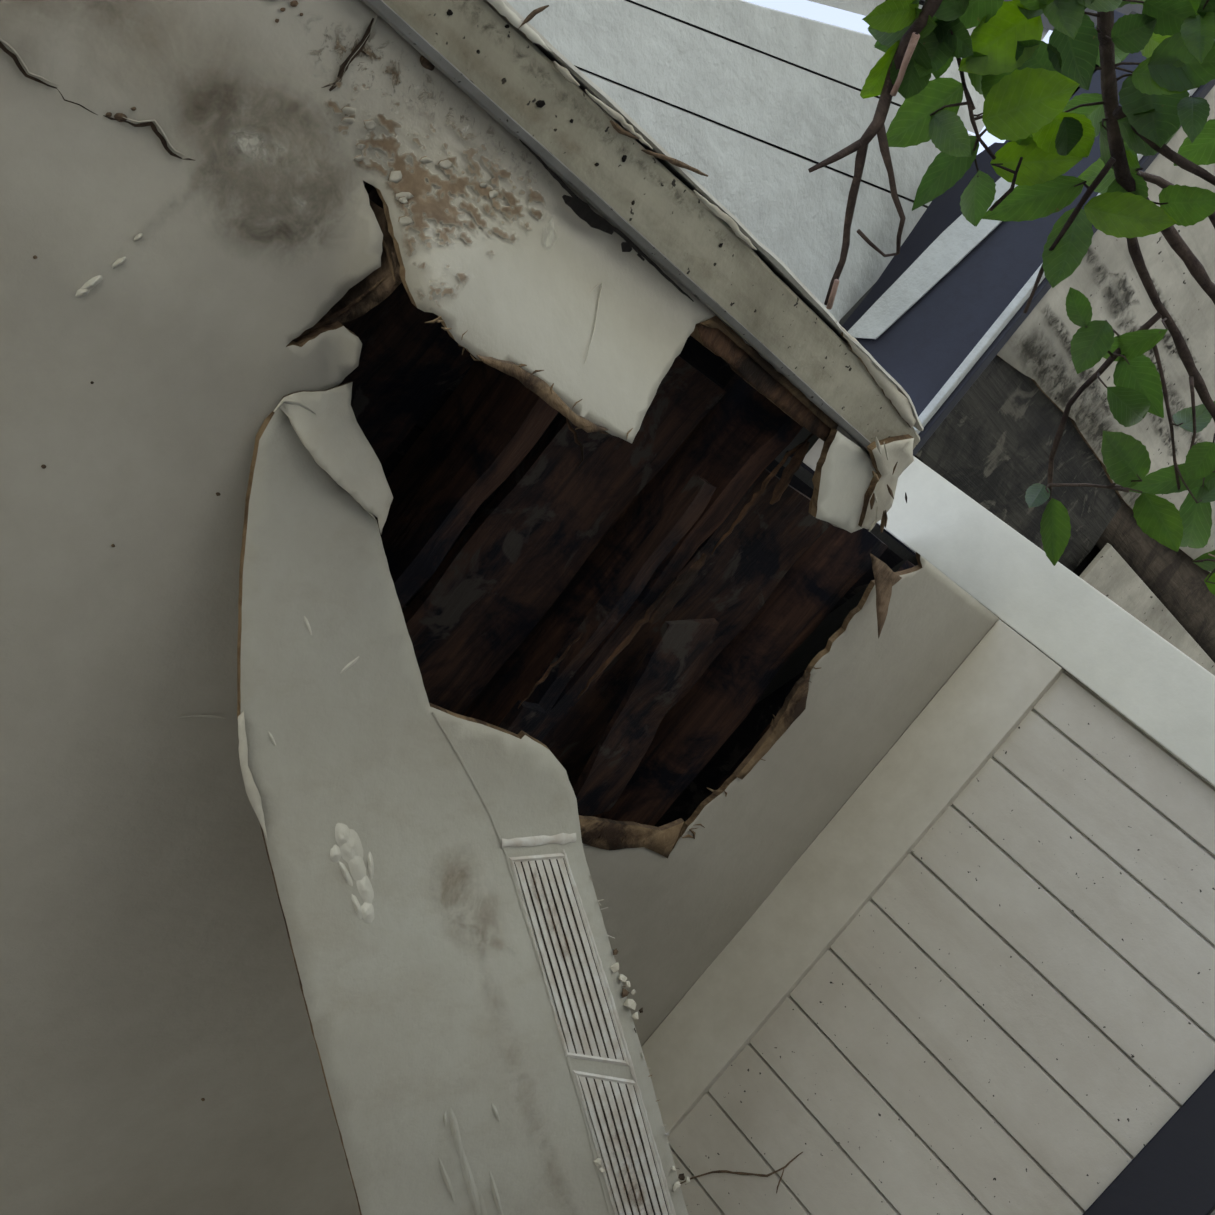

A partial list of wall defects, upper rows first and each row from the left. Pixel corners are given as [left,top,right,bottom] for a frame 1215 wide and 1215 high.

crack [0,38,195,161]
leakage [317,34,433,98]
peeling [292,82,545,342]
peeling [477,355,608,433]
peeling [273,381,393,535]
peeling [733,671,811,779]
peeling [579,815,684,858]